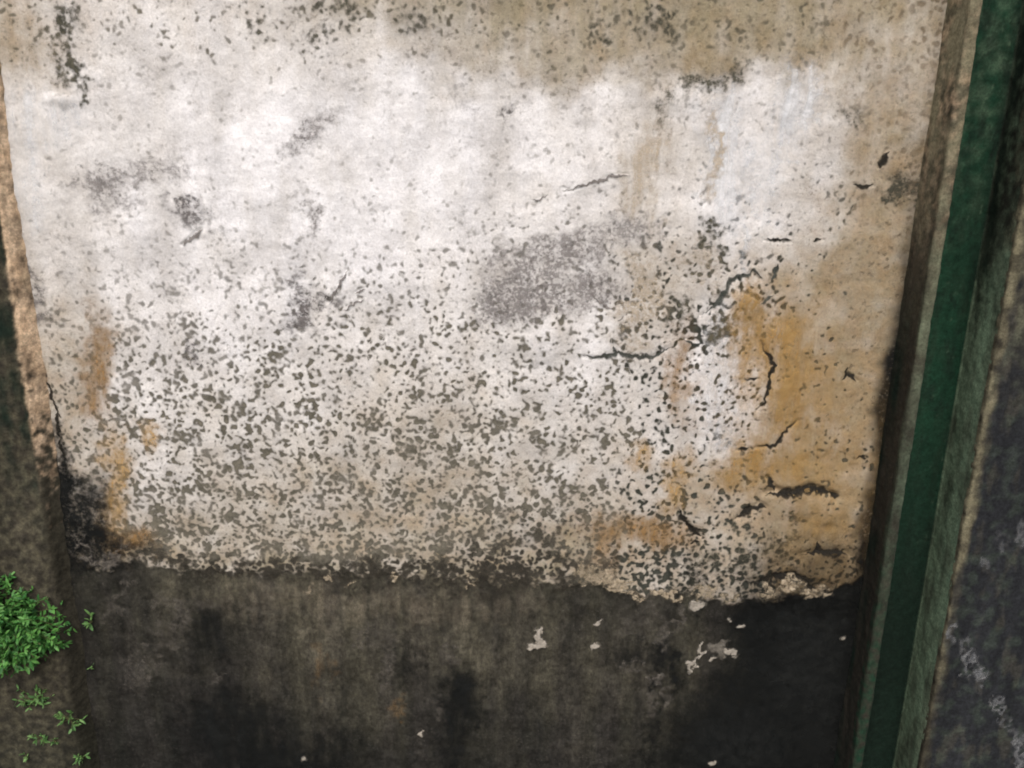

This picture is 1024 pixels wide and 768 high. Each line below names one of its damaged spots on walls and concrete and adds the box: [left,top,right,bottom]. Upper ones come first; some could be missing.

crack [533,174,630,202]
crack [583,339,705,360]
crack [746,343,777,409]
peeling [50,217,874,603]
crack [738,421,796,451]
leakage [52,423,607,592]
crack [735,476,839,519]
leakage [656,510,865,768]
leakage [189,685,351,768]